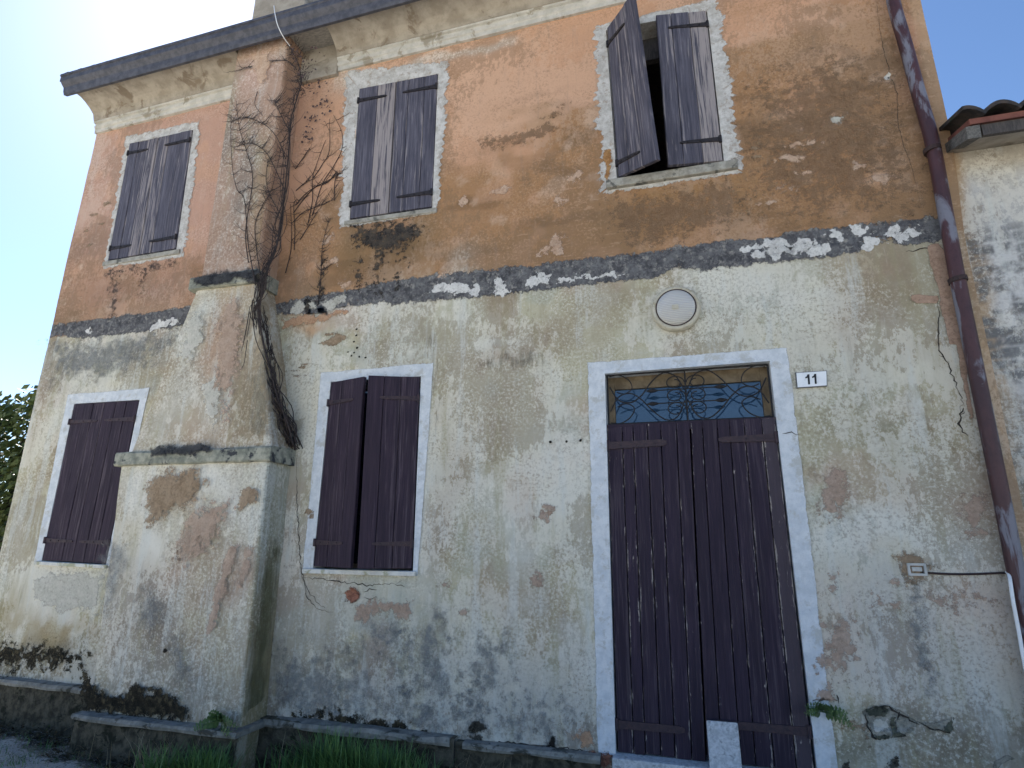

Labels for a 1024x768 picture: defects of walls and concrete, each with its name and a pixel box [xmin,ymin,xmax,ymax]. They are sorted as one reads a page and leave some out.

water stain [349,215,429,299]
flaking render [536,233,565,257]
peeling [739,223,922,261]
peeling [429,271,480,297]
peeling [493,277,511,297]
peeling [525,270,625,288]
flaking render [281,279,367,358]
crack [937,303,968,436]
flaking render [141,465,259,568]
flaking render [345,586,413,624]
water stain [248,548,507,735]
flaking render [862,706,954,740]